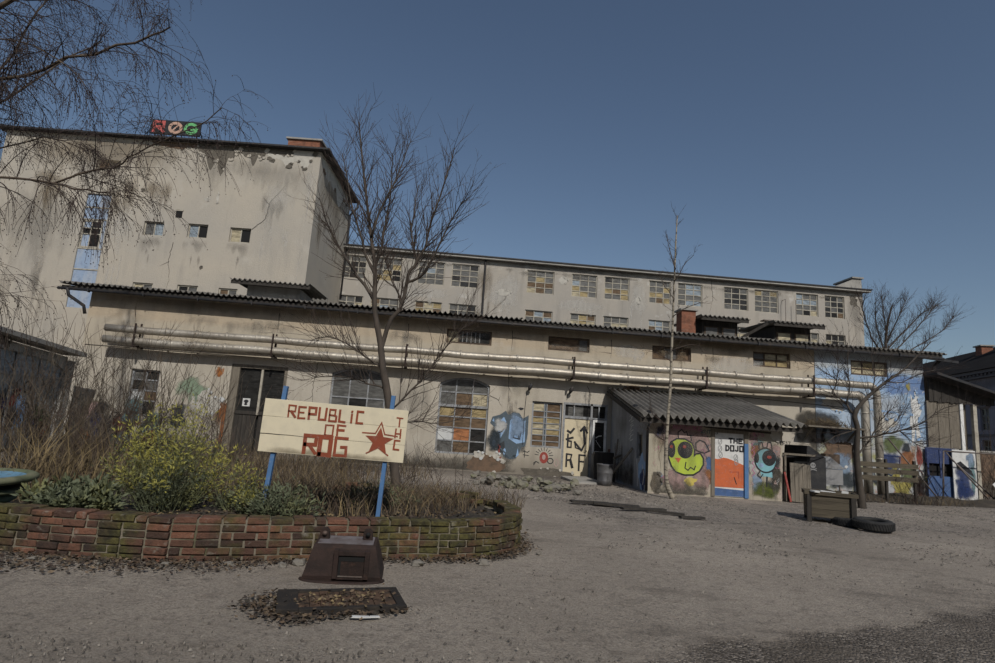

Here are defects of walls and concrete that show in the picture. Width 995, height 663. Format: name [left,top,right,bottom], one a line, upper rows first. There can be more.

flaking render [152,140,350,207]